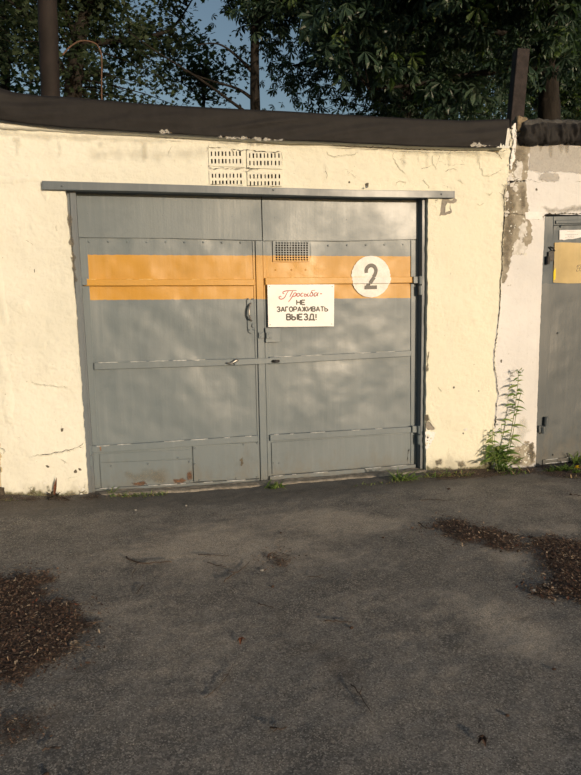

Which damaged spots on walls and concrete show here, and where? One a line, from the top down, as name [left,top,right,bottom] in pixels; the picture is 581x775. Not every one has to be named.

crack [325,145,548,428]
peeling [434,198,459,216]
peeling [496,116,542,283]
peeling [425,441,581,479]